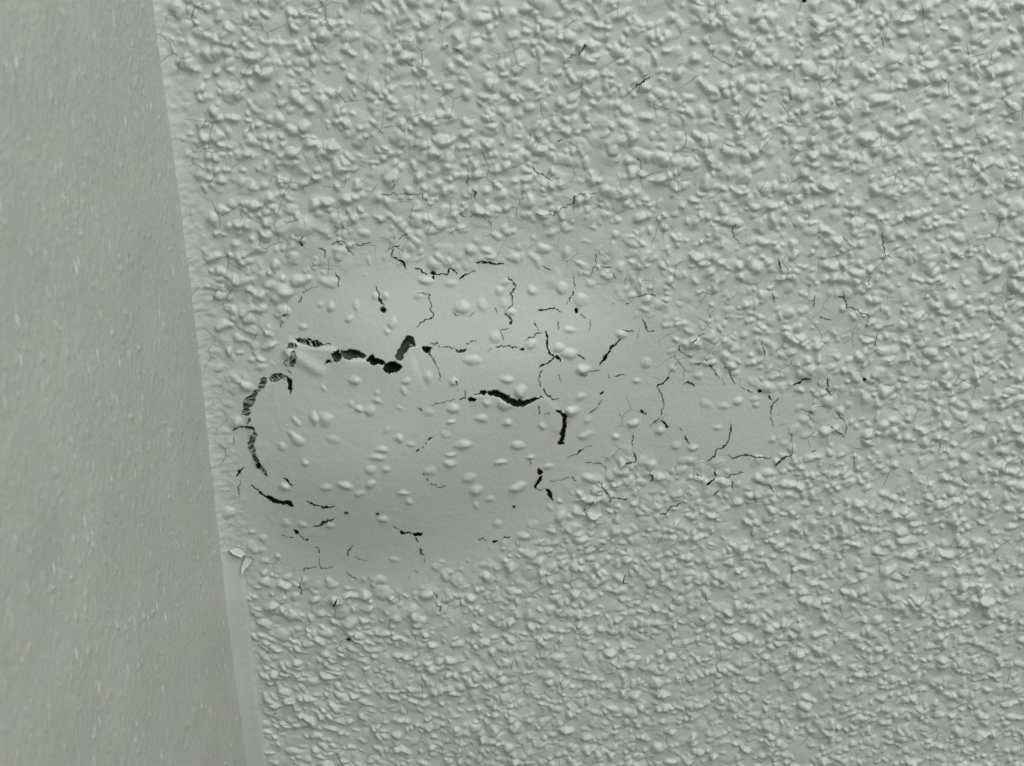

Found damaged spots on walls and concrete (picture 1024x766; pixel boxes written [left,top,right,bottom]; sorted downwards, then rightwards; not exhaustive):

crack [232,233,848,595]
crack [813,295,894,345]